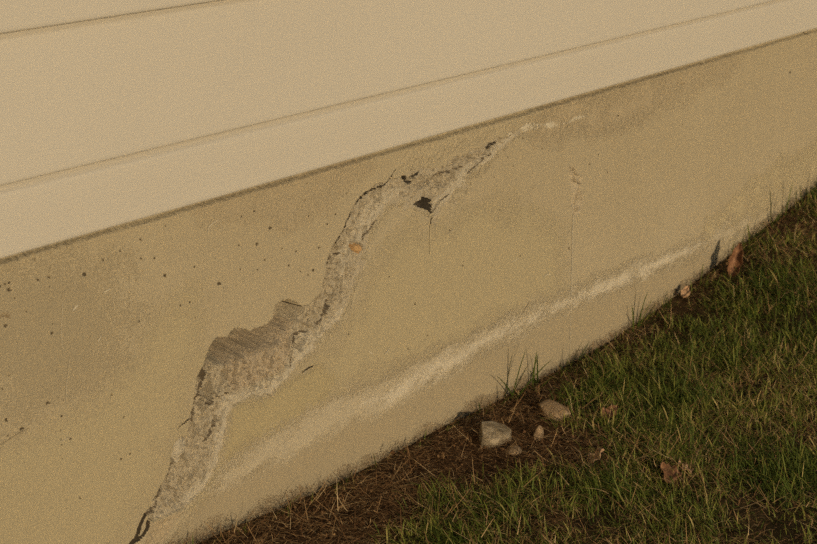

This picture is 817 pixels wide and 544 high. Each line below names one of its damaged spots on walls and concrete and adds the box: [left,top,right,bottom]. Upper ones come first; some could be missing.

spalling [145,70,685,521]
water stain [166,137,817,544]